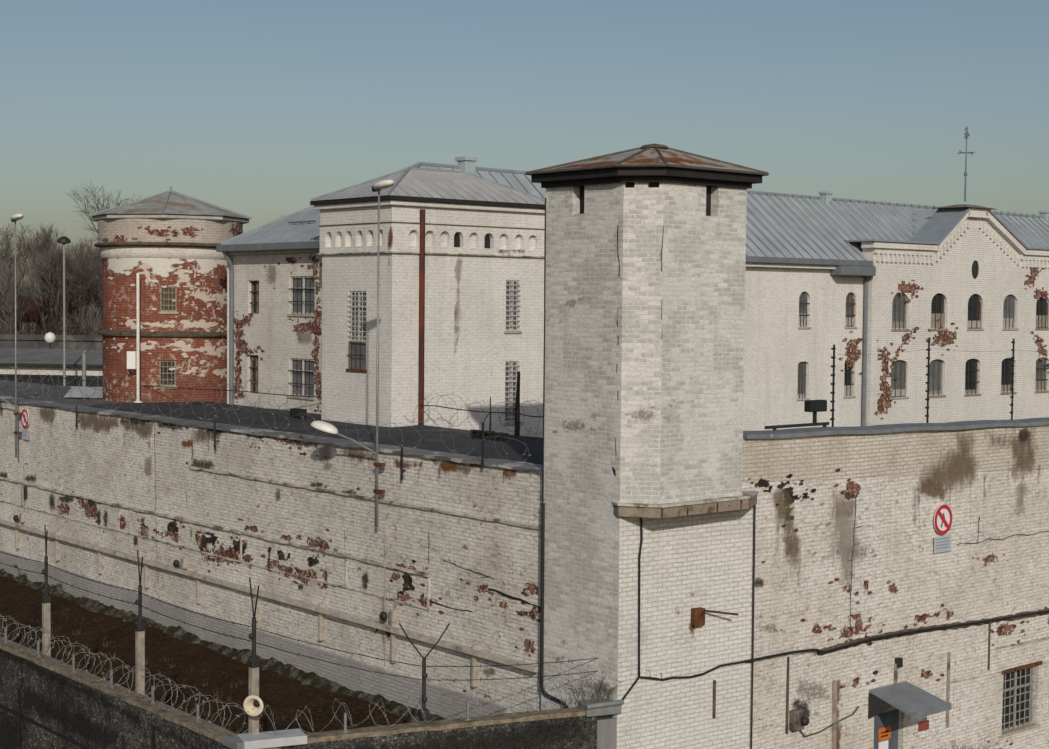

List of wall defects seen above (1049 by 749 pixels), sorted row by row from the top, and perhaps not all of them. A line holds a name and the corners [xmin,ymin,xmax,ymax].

rust [555,151,722,169]
peeling [104,258,264,403]
spalling [263,254,322,412]
spalling [874,319,958,419]
leakage [914,435,986,506]
leakage [992,428,1040,475]
spalling [50,491,337,590]
crack [417,533,538,607]
leakage [774,490,799,562]
leakage [833,496,858,575]
spalling [460,578,540,656]
spalling [800,578,886,646]